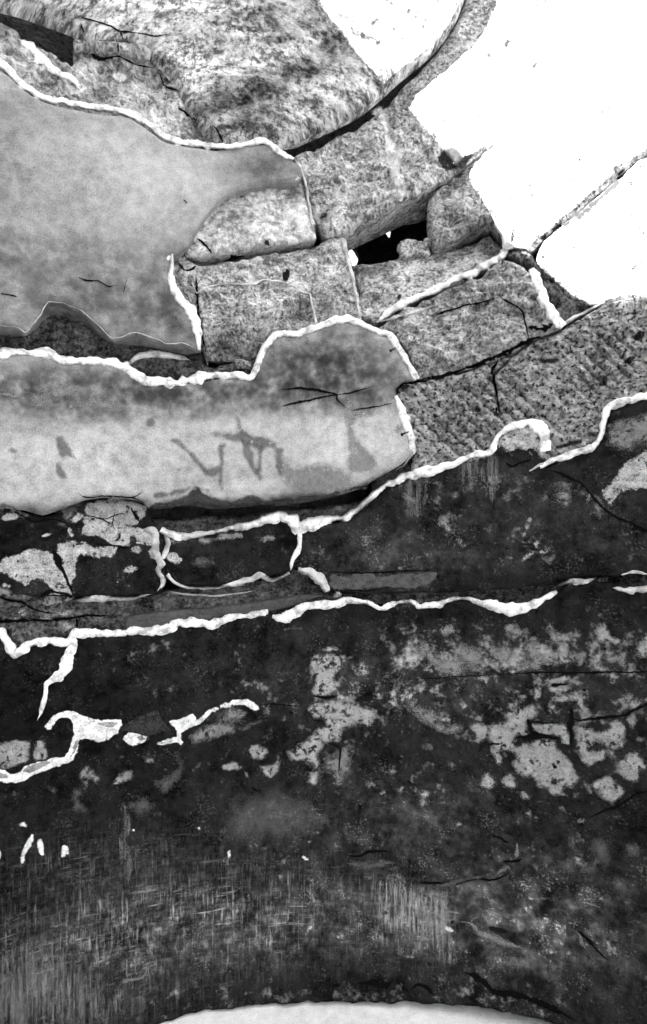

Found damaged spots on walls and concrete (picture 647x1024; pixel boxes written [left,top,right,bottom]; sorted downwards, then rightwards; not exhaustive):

spalling [438,147,481,171]
crack [420,296,553,419]
crack [279,386,392,411]
peeling [587,416,647,506]
peeling [191,532,243,544]
peeling [0,513,182,630]
peeling [120,710,171,744]
peeling [191,708,254,743]
peeling [0,741,50,778]
peeling [74,767,99,810]
peeling [114,771,132,785]
peeling [156,771,180,791]